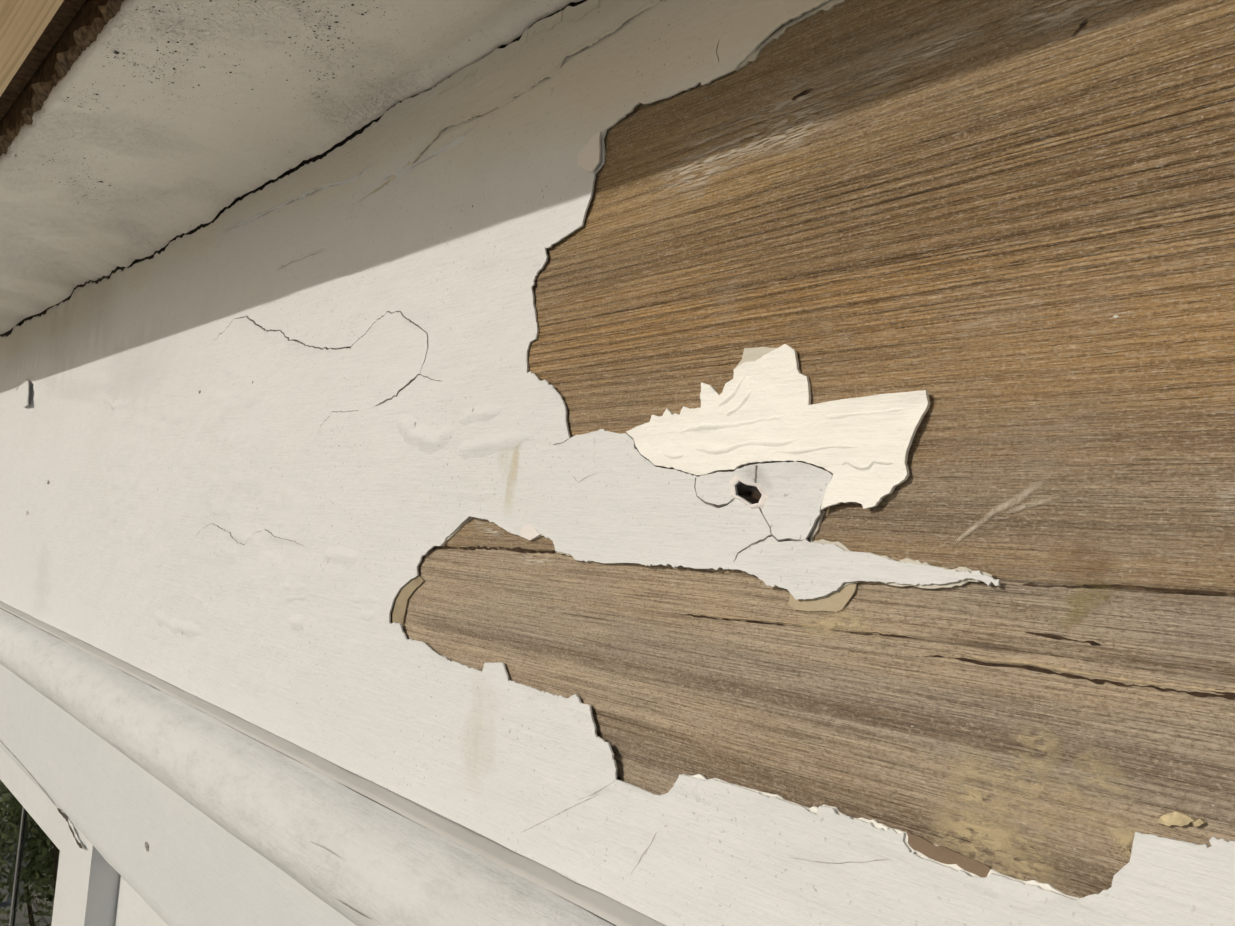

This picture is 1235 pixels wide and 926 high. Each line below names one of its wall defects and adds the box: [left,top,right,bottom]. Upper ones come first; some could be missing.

water stain [103,0,215,119]
water stain [275,0,396,111]
crack [0,0,600,337]
crack [215,311,440,440]
crack [694,466,804,559]
peeling [391,0,1235,900]